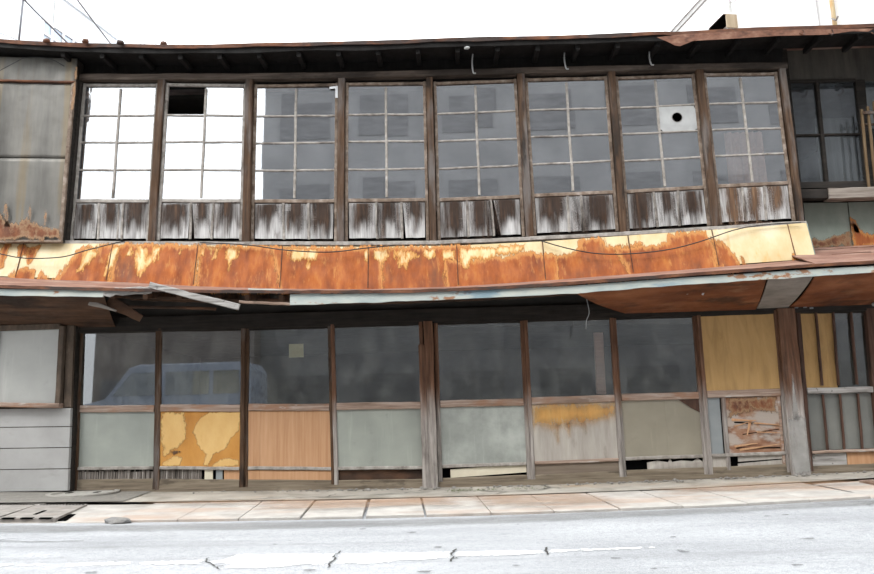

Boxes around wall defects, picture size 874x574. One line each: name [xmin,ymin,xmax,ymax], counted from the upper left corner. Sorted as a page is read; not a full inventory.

water stain [254,202,335,239]
water stain [349,201,425,240]
water stain [441,200,522,239]
water stain [538,195,614,235]
water stain [630,191,703,231]
corrosion [0,204,747,296]
peeling [160,412,240,467]